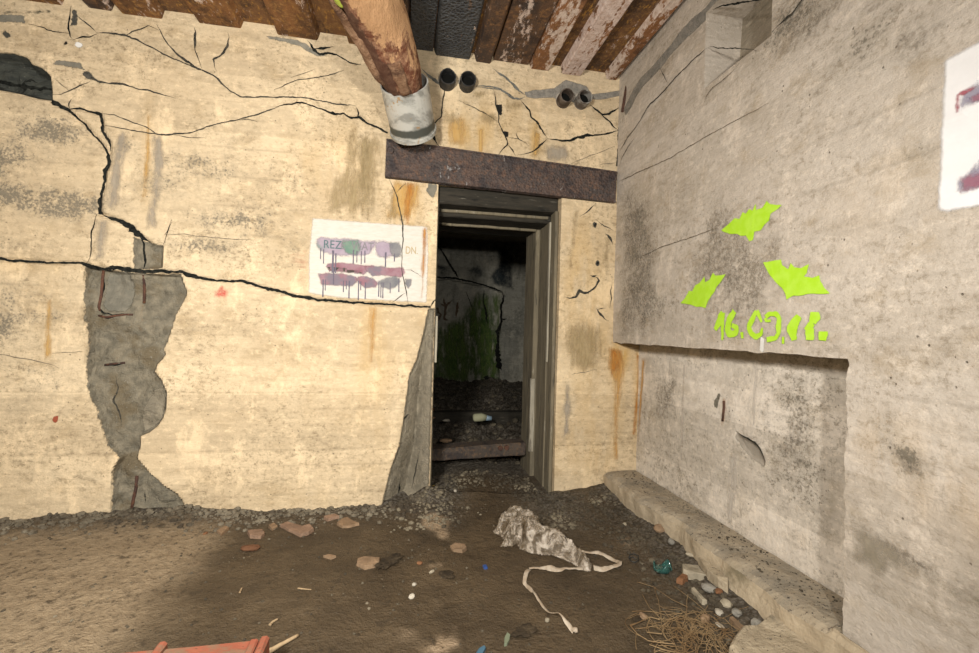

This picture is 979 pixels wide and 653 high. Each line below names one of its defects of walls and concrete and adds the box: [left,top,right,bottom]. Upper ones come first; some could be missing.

crack [715,0,759,9]
spalling [0,53,93,101]
crack [422,46,768,181]
crack [0,8,505,380]
crack [642,228,716,256]
crack [566,275,612,321]
leakage [569,328,598,368]
spalling [83,237,187,511]
corrosion [610,349,624,423]
corrosion [633,355,644,434]
spalling [736,431,766,466]